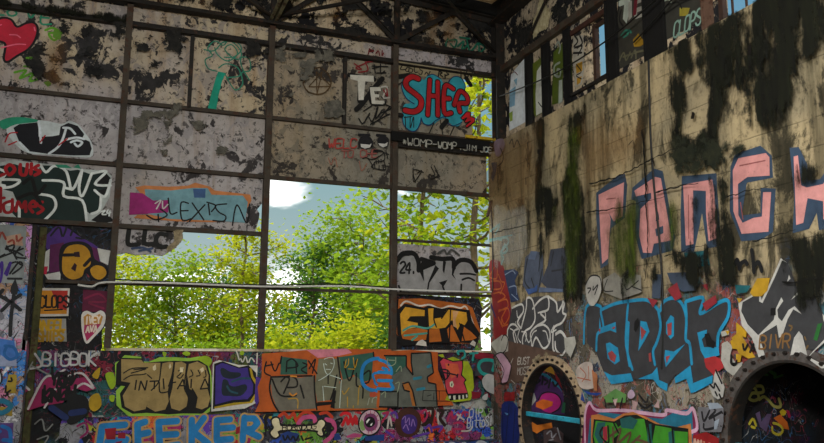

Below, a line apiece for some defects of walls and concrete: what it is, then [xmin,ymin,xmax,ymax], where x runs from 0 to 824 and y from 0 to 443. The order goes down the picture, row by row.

peeling [210,0,233,13]
peeling [24,41,48,81]
peeling [59,19,104,78]
peeling [112,21,153,52]
peeling [164,28,189,65]
leakage [663,0,824,291]
leakage [535,103,589,303]
leakage [609,198,638,303]
leakage [782,231,824,312]